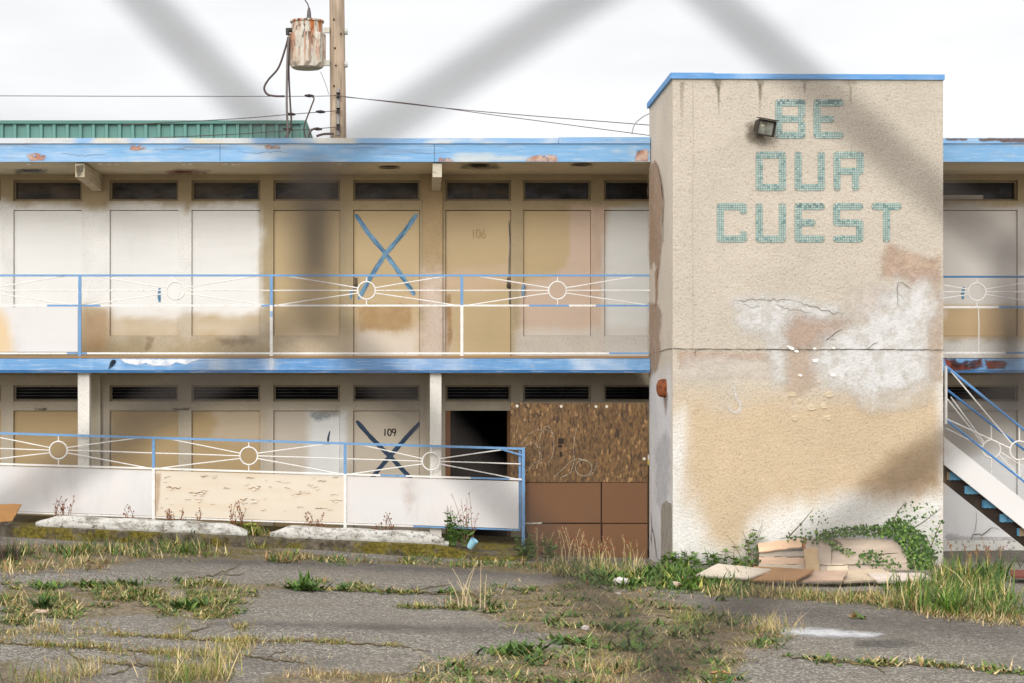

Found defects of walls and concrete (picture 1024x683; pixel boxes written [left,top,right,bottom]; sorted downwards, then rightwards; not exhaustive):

peeling [27,153,45,165]
peeling [635,149,648,161]
crack [655,299,938,356]
corrosion [929,309,995,380]